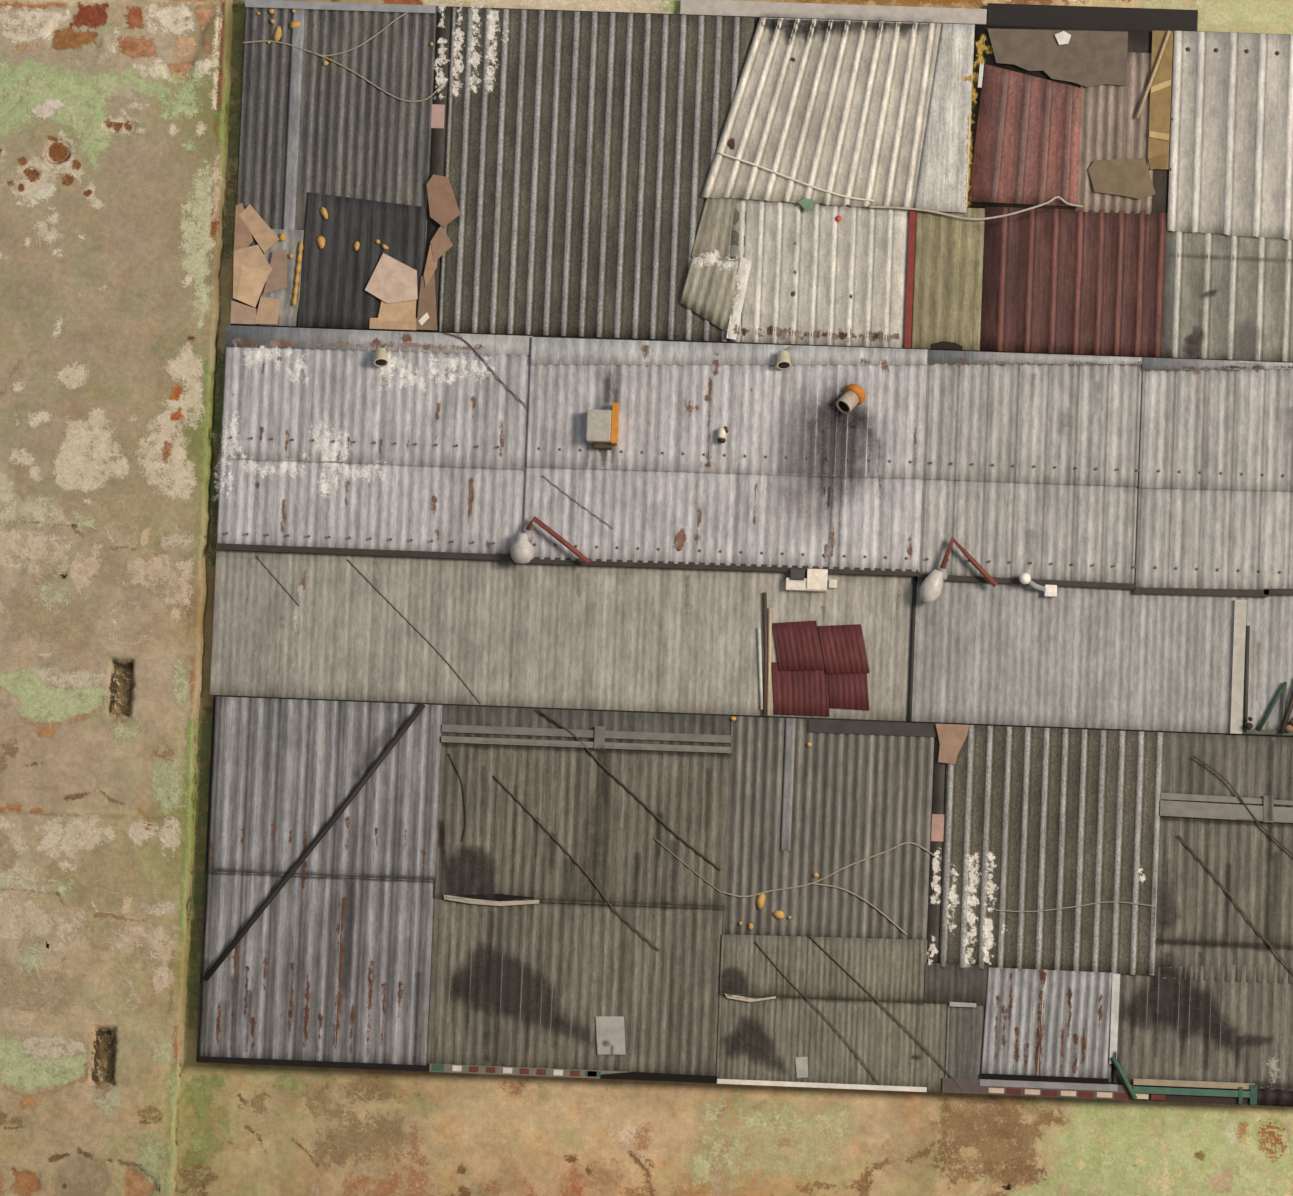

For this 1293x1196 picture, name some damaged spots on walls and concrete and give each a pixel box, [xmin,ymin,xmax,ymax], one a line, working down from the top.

peeling [0,0,226,624]
peeling [242,345,312,386]
peeling [377,351,495,395]
peeling [214,409,391,505]
spalling [121,554,196,637]
peeling [0,1034,134,1120]
peeling [1266,1053,1283,1086]
peeling [1008,1098,1293,1196]